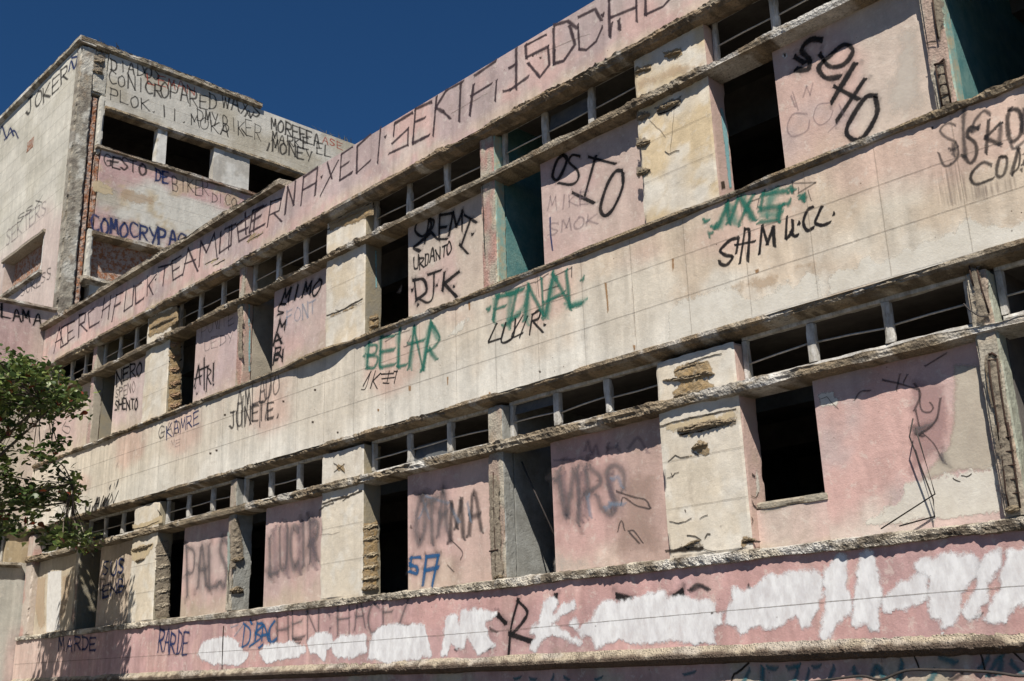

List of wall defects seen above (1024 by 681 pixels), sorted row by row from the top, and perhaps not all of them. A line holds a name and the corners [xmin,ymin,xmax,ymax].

spalling [934,58,952,107]
spalling [145,297,182,411]
spalling [662,353,722,398]
peeling [660,408,737,461]
peeling [866,352,1021,525]
spalling [131,540,171,619]
spalling [361,520,380,591]